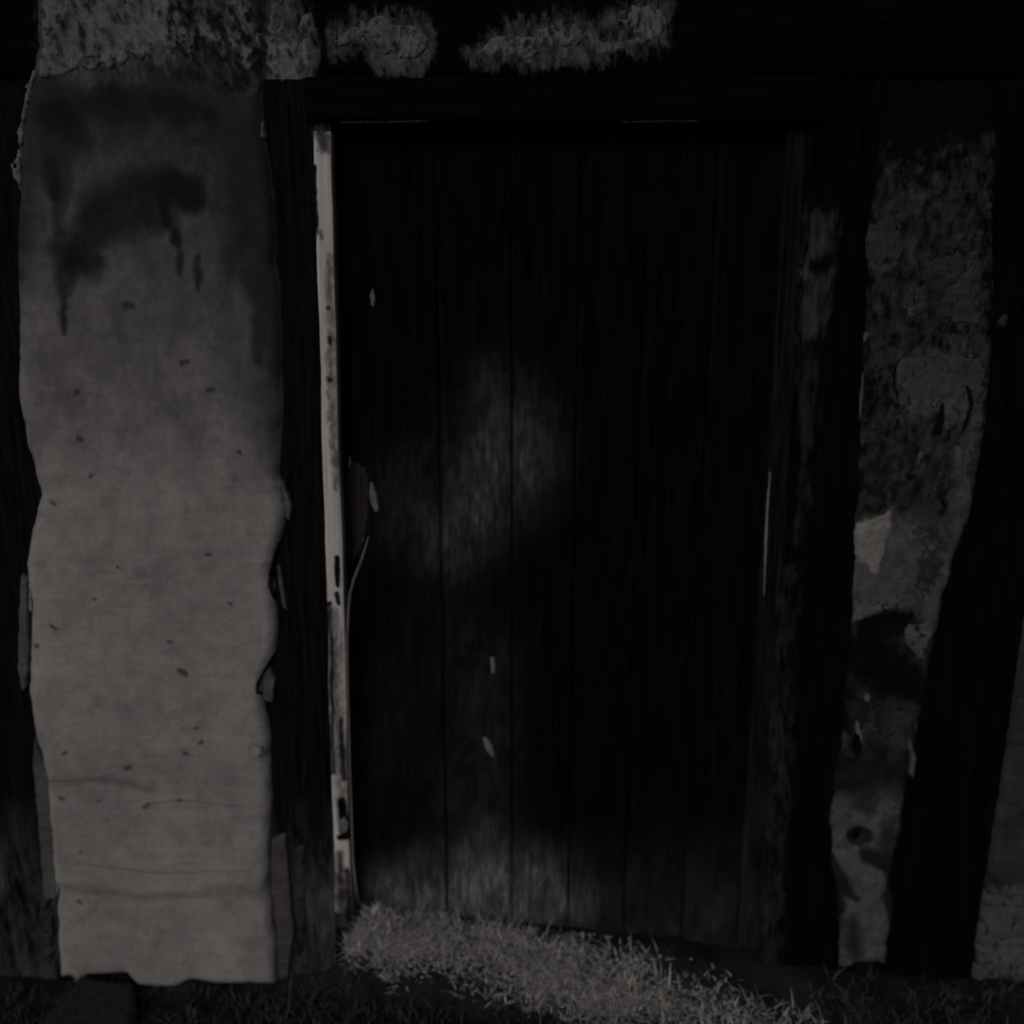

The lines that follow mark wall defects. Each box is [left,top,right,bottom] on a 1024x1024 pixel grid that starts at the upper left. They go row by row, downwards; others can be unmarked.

leakage [19,0,280,444]
peeling [11,0,432,192]
peeling [830,157,990,966]